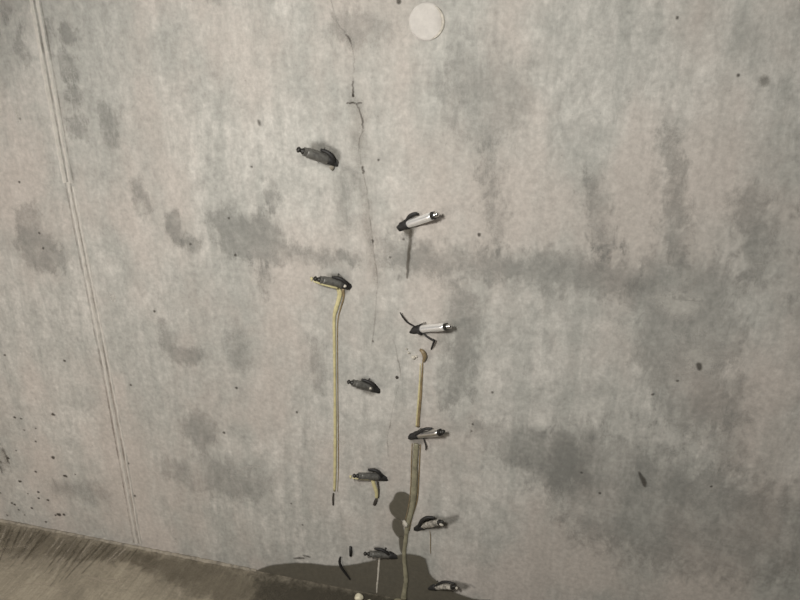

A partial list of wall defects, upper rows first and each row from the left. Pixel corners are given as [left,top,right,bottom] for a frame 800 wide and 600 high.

leakage [248,443,477,600]